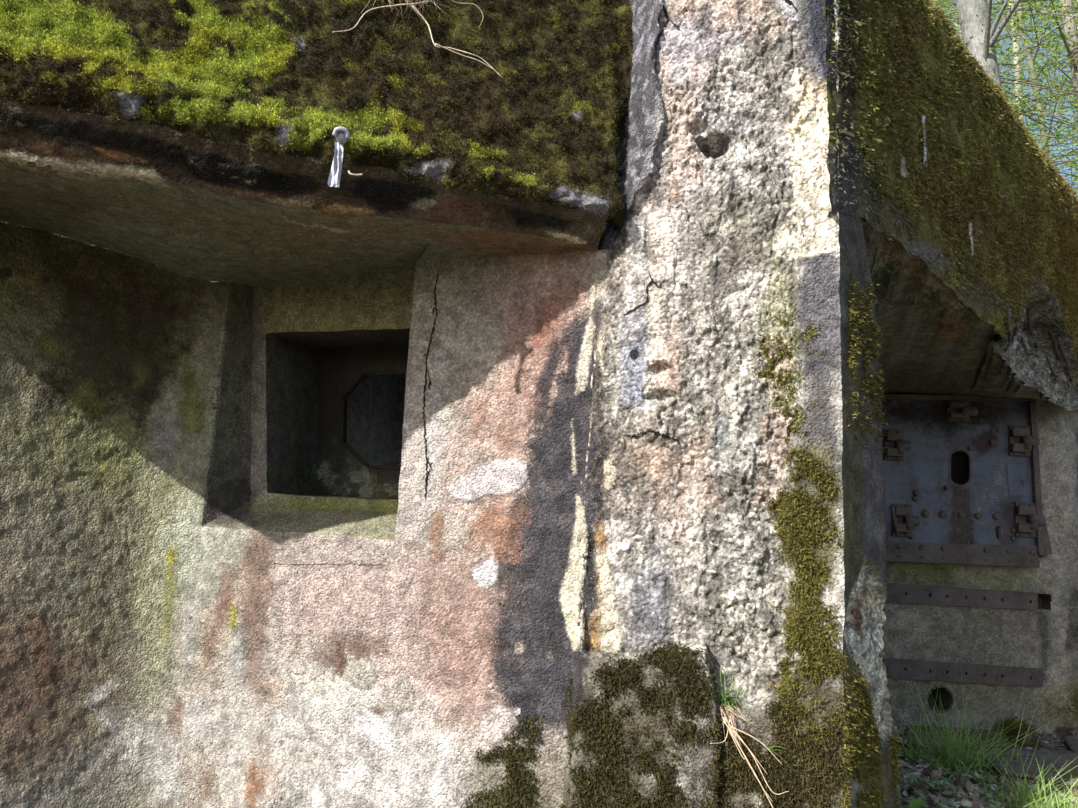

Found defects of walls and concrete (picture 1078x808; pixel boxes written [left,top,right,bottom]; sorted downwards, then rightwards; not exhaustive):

crack [651,5,683,62]
crack [422,273,439,499]
rust [882,400,1001,454]
spalling [1001,278,1078,412]
water stain [488,273,623,747]